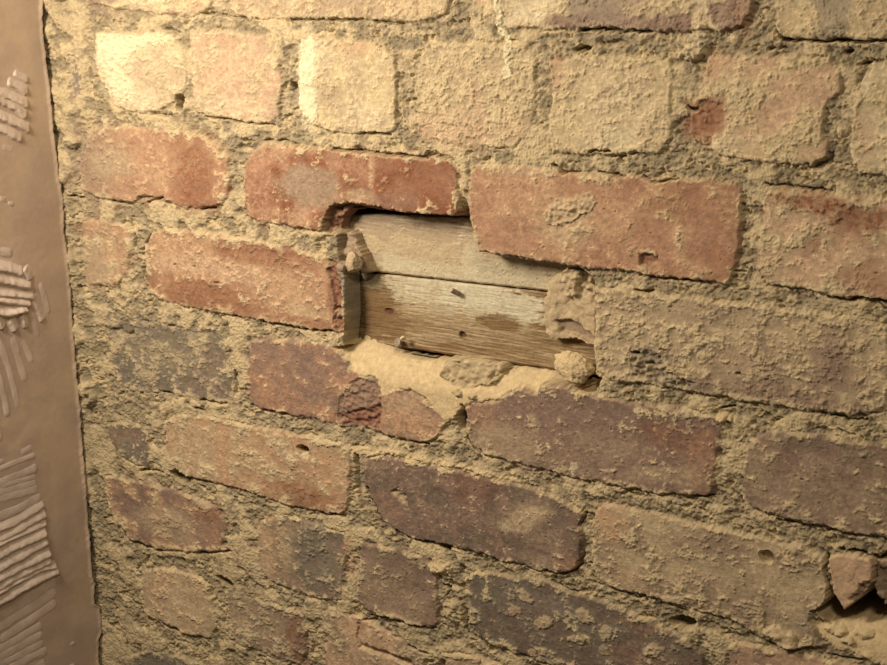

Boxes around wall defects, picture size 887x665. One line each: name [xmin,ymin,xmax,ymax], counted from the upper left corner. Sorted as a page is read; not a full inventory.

spalling [323,200,474,235]
spalling [481,251,597,308]
spalling [325,266,361,344]
spalling [409,350,441,358]
spalling [336,376,383,430]
spalling [813,584,841,619]
spalling [871,557,887,604]